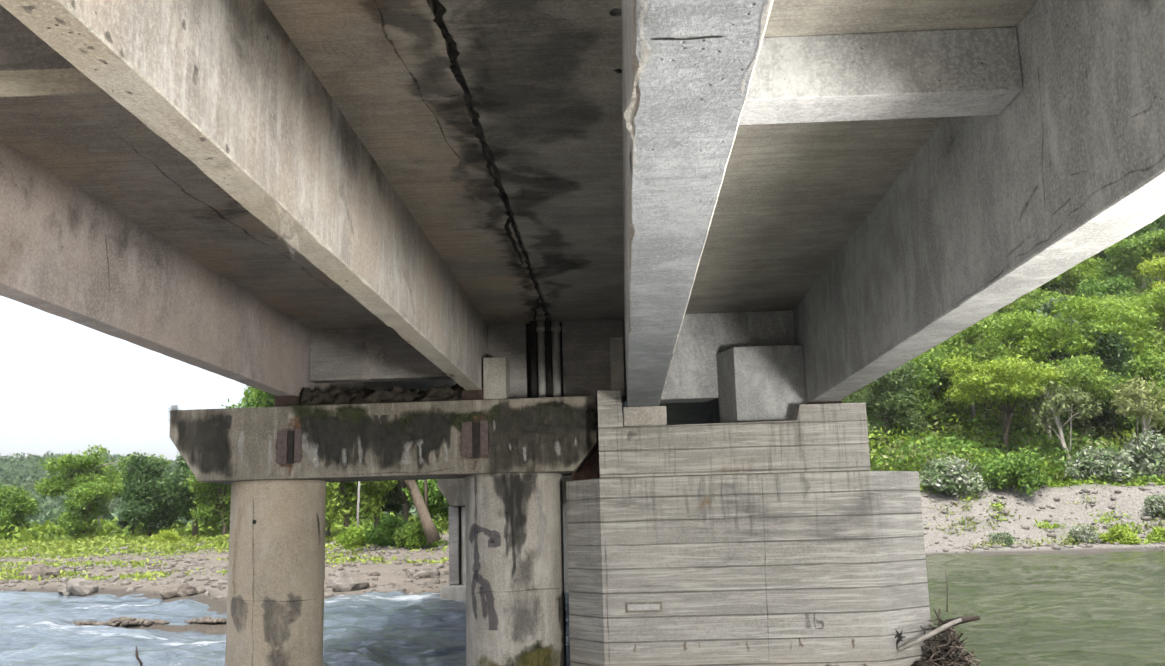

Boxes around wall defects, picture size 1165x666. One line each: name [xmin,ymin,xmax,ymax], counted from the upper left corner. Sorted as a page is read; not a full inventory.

crack [433,0,548,321]
water stain [171,405,242,477]
water stain [301,413,451,470]
water stain [484,401,594,581]
water stain [231,598,243,624]
water stain [263,599,285,666]
water stain [288,595,301,622]
water stain [513,601,539,640]